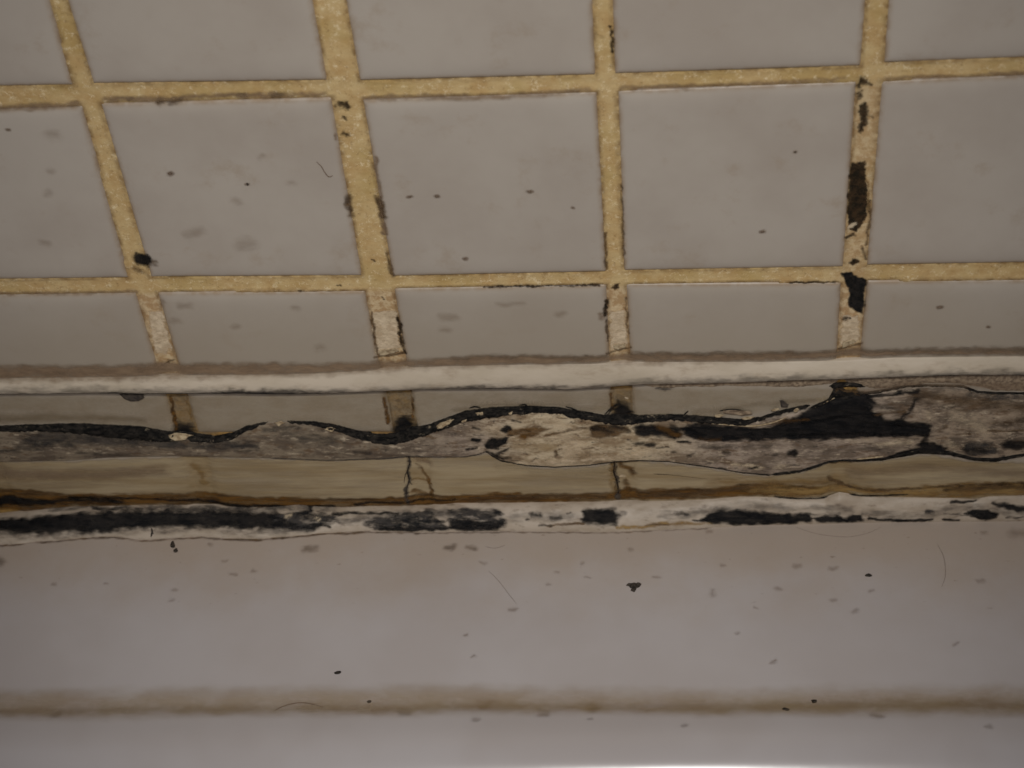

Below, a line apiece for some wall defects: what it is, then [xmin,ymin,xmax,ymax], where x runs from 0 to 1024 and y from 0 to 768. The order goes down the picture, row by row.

water stain [856,77,873,132]
water stain [790,161,871,320]
water stain [484,283,619,339]
peeling [168,433,193,441]
crack [403,457,412,504]
peeling [436,412,483,429]
water stain [0,377,1024,535]